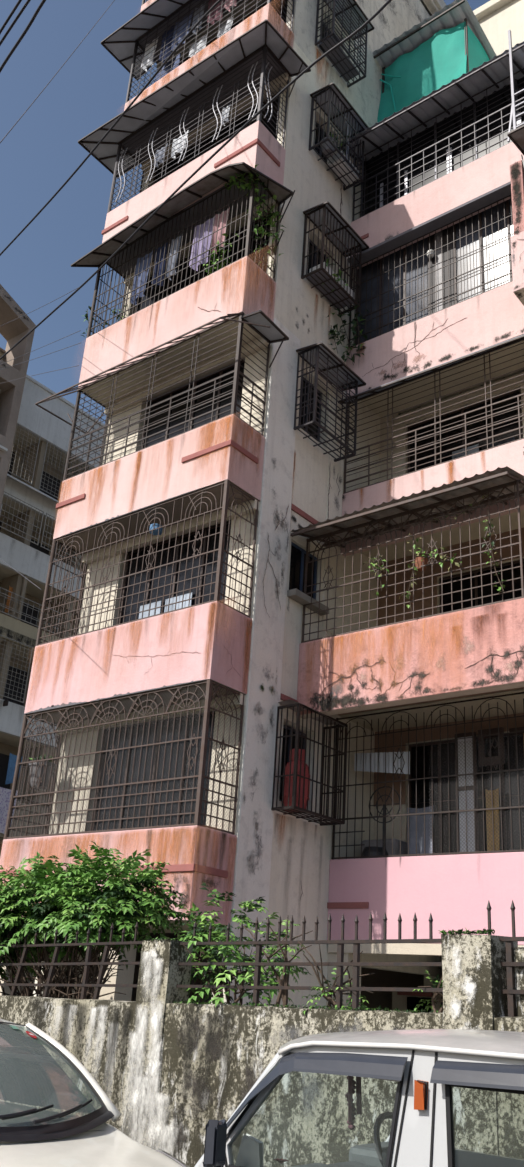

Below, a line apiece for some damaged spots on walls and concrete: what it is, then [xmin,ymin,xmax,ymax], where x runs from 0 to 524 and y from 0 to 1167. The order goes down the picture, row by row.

crack [364,318,466,376]
water stain [309,646,524,711]
rust [120,828,235,880]
water stain [62,1002,84,1054]
water stain [108,1008,130,1062]
water stain [165,1013,232,1157]
water stain [240,1047,264,1100]